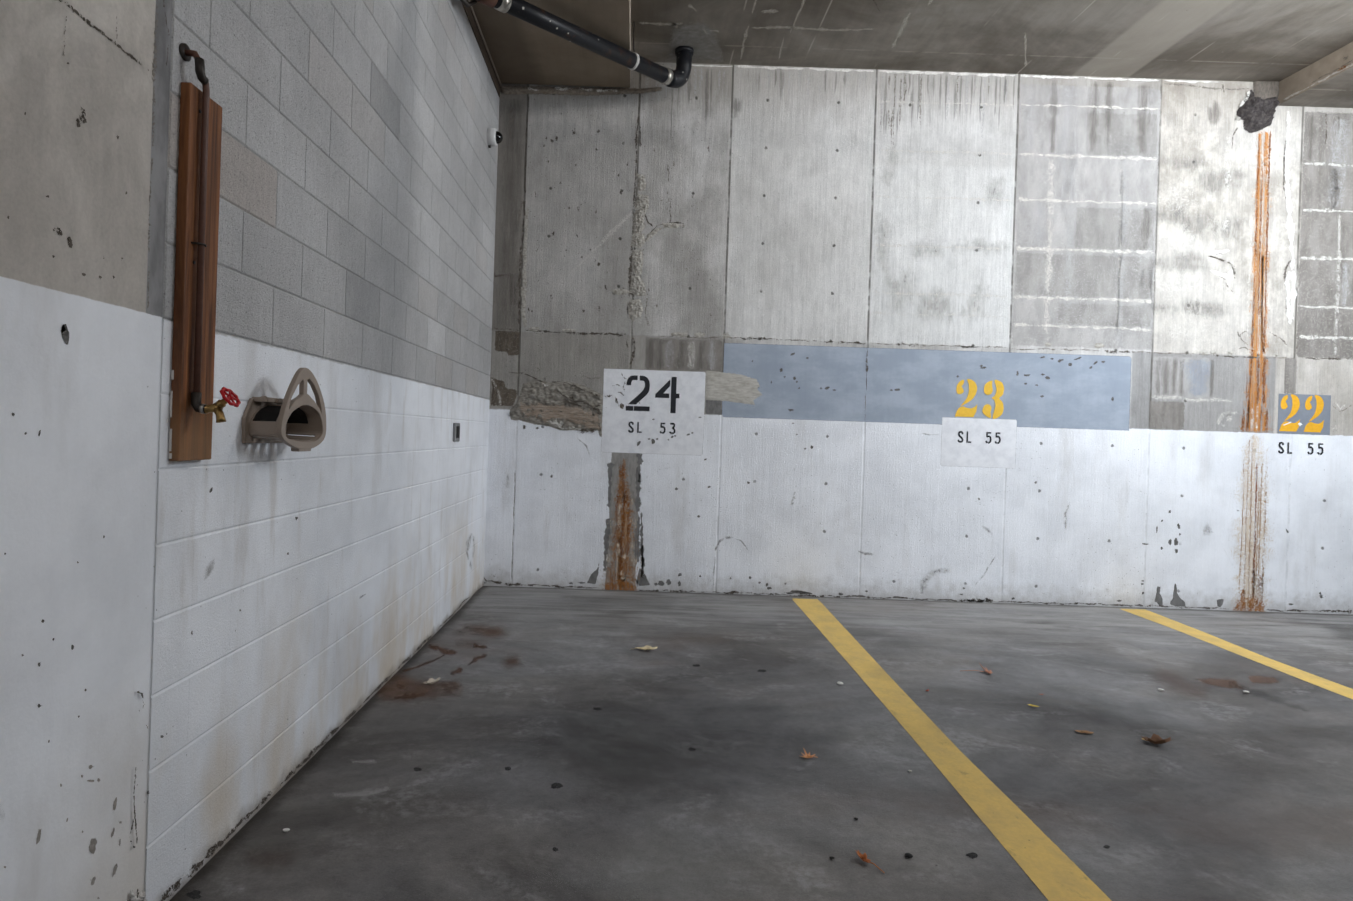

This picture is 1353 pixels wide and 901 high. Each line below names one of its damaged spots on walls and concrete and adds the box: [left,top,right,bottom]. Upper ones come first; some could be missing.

spalling [1232,81,1280,146]
crack [494,77,1353,435]
spalling [508,380,603,437]
corrosion [1231,131,1275,612]
corrosion [597,458,645,591]